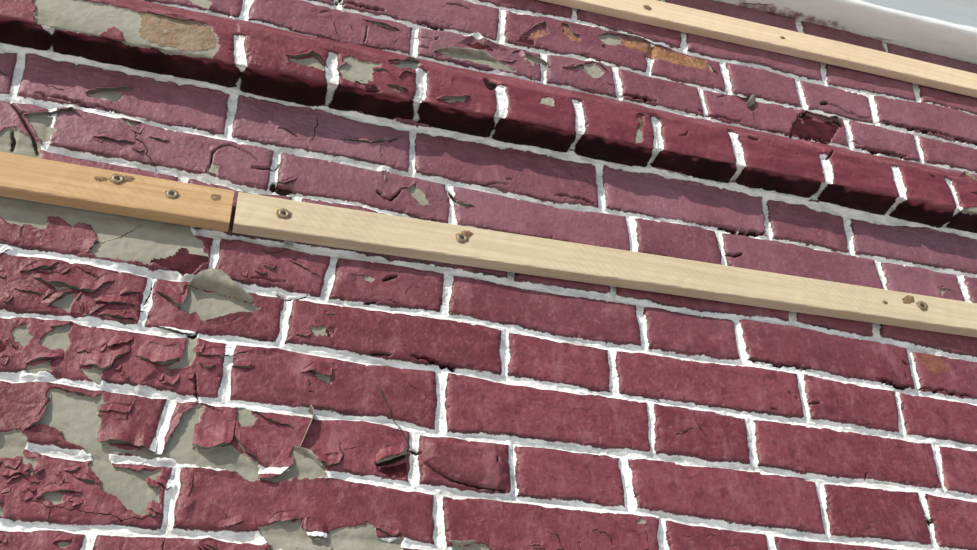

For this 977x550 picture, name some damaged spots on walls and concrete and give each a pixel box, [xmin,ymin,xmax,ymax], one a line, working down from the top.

peeling [35,0,219,59]
peeling [286,49,420,93]
peeling [416,20,550,72]
peeling [562,53,613,86]
peeling [599,32,718,74]
crack [11,104,39,155]
peeling [635,111,646,143]
peeling [789,110,844,144]
peeling [0,196,358,526]
spalling [376,442,420,478]
peeling [259,511,403,550]
peeling [449,540,489,550]